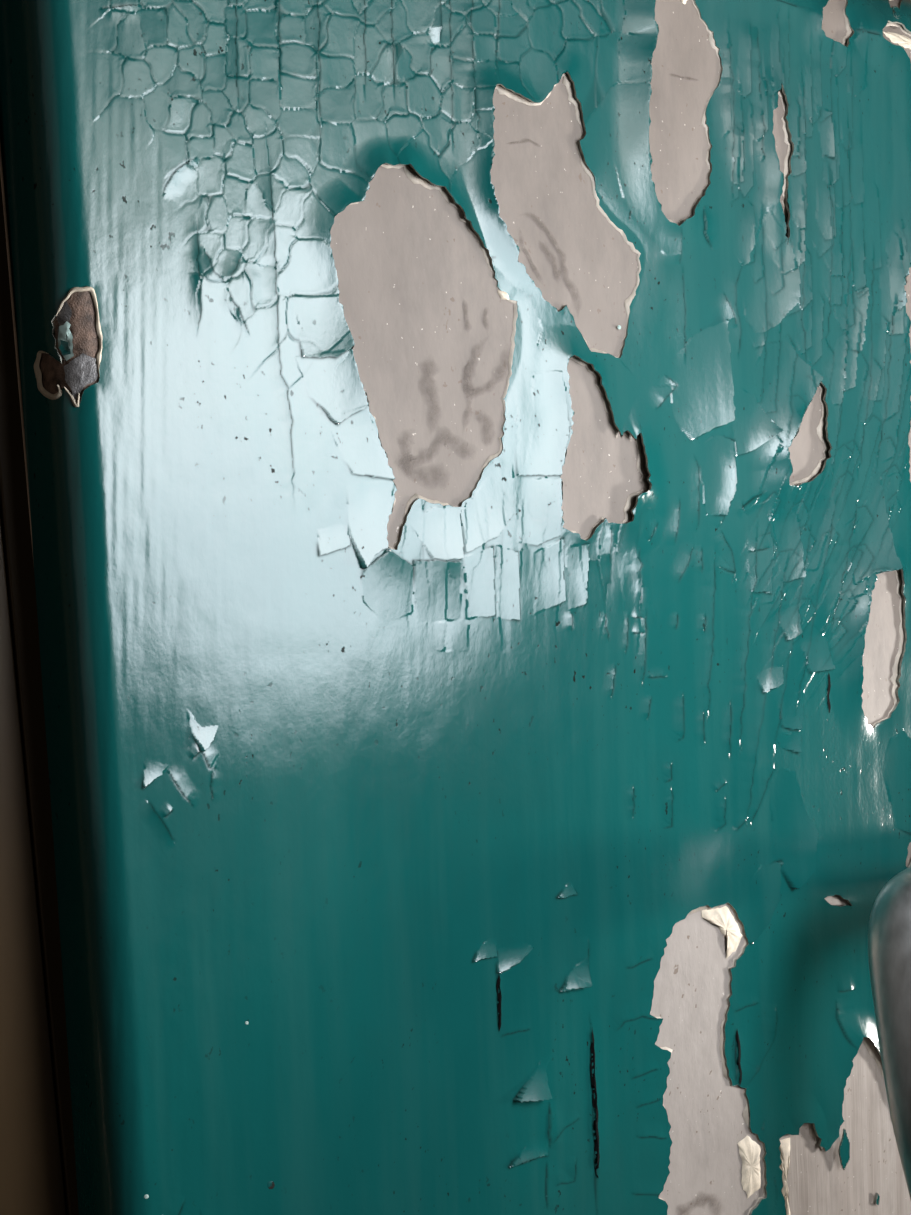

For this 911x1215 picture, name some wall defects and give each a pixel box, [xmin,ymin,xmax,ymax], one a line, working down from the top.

peeling [34,286,103,408]
crack [86,0,641,523]
peeling [295,60,659,624]
crack [405,0,907,844]
peeling [637,0,733,236]
peeling [668,72,840,593]
peeling [810,0,911,99]
peeling [846,222,911,873]
peeling [187,708,219,751]
crack [491,964,539,1044]
crack [554,929,604,1215]
peeling [640,891,911,1215]